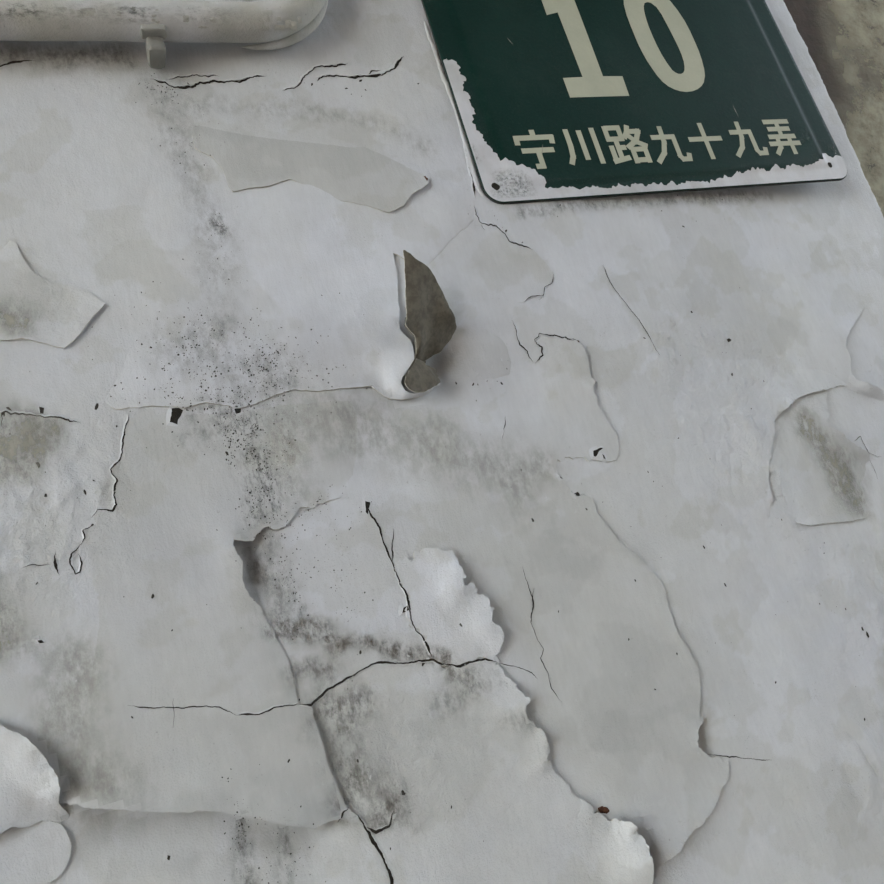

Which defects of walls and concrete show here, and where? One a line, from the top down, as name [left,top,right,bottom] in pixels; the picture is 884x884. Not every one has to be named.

crack [0,60,35,69]
crack [151,73,266,89]
crack [282,56,404,90]
crack [0,408,81,430]
peeling [727,369,870,541]
peeling [0,125,729,884]
crack [129,507,560,723]
crack [337,806,395,884]